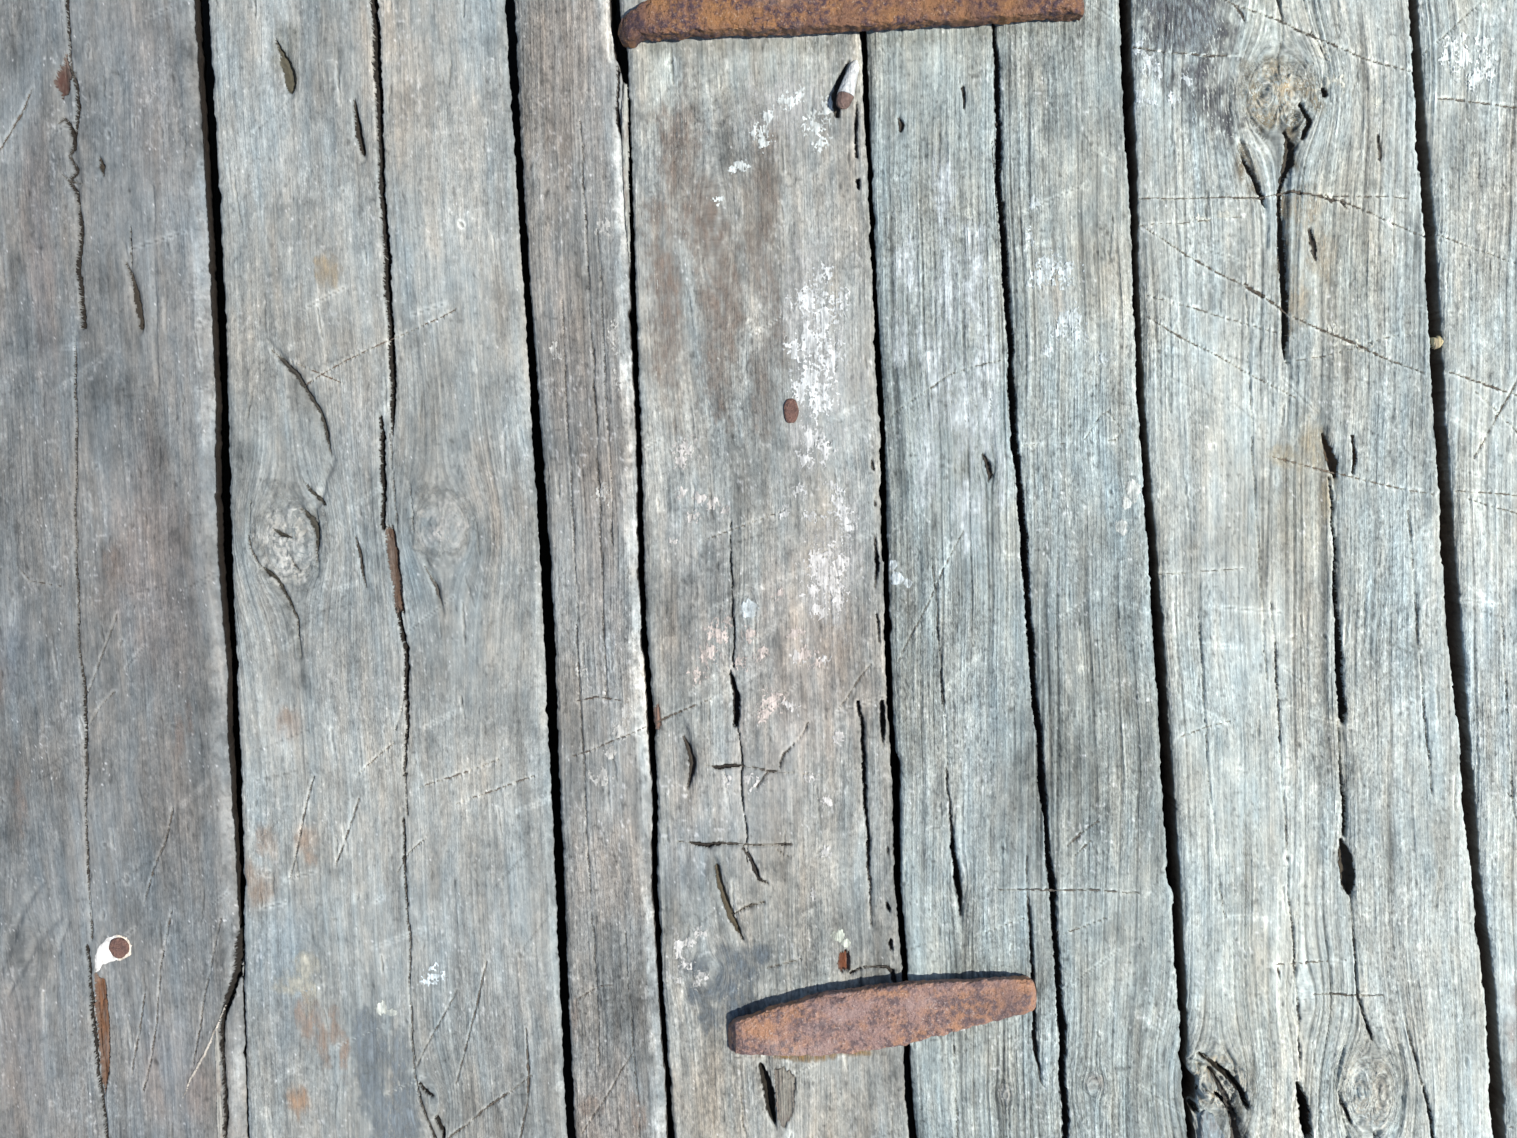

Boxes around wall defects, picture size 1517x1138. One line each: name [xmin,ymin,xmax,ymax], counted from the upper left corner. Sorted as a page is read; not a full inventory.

crack [369,0,414,531]
crack [1239,102,1312,403]
crack [58,0,109,1138]
crack [424,566,442,603]
crack [991,24,1070,1138]
crack [1251,439,1288,850]
crack [1328,478,1347,835]
crack [1407,510,1432,792]
crack [395,606,446,1138]
crack [1288,899,1301,1063]